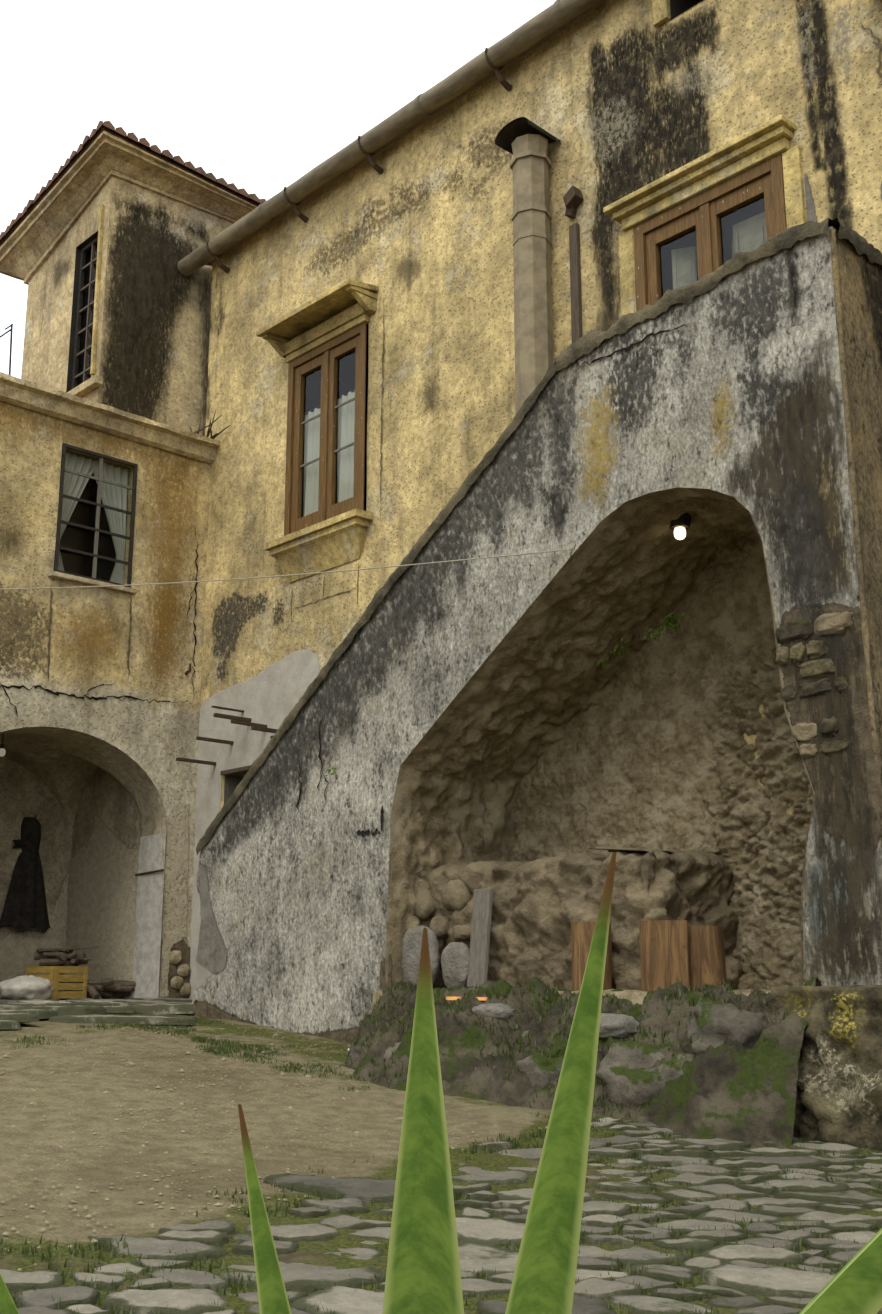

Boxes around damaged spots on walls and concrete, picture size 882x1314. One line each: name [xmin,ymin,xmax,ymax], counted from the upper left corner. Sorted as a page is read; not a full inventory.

leakage [796,0,852,230]
crack [853,22,882,85]
leakage [102,200,223,426]
leakage [210,6,720,871]
crack [571,324,686,371]
crack [0,531,199,720]
leakage [714,246,882,986]